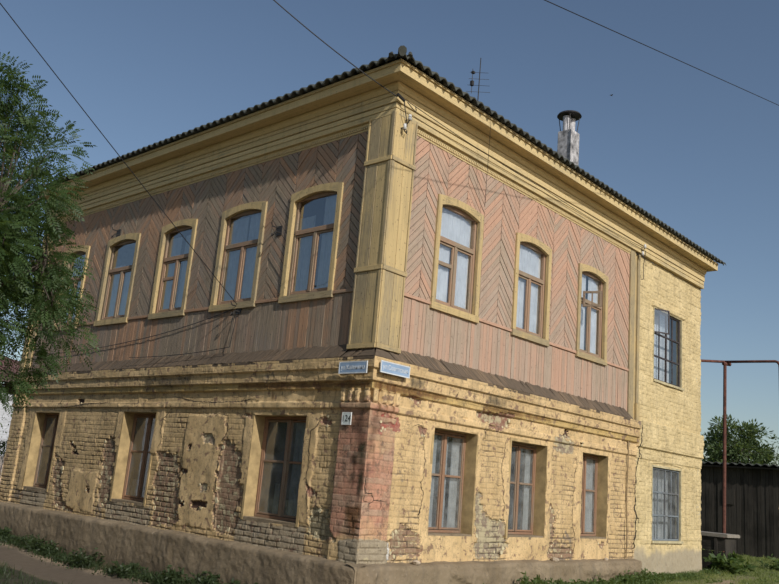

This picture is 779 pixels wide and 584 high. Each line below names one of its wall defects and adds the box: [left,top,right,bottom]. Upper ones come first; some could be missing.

peeling [378,413,401,435]
spalling [476,406,515,432]
spalling [151,432,243,538]
crack [303,417,322,509]
crack [632,421,643,556]
spalling [387,524,422,563]
spalling [473,491,508,560]
spalling [547,503,575,559]